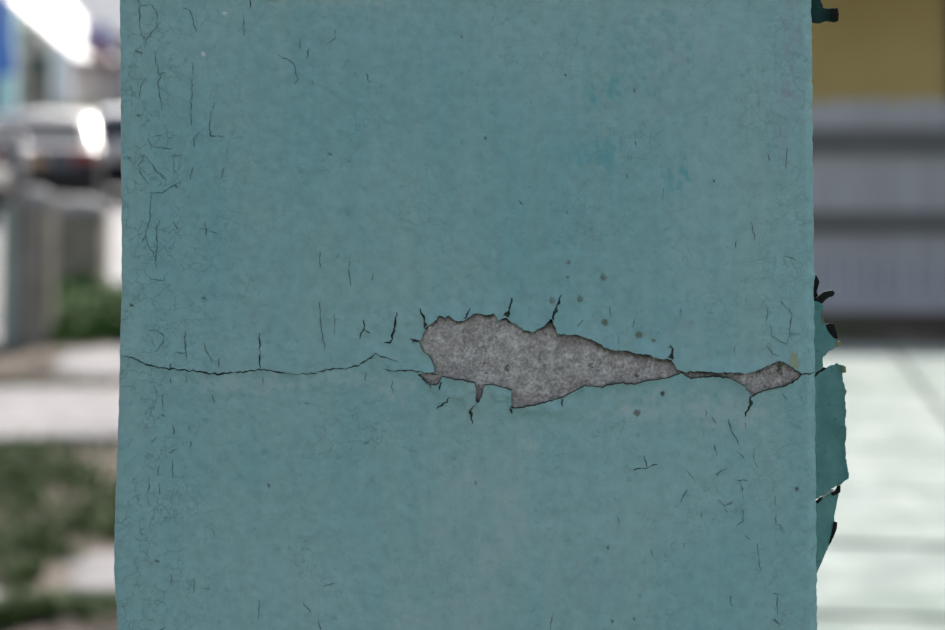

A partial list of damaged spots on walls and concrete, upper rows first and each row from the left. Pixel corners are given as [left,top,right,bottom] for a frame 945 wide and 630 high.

crack [135,0,165,110]
peeling [811,0,839,24]
crack [138,64,222,281]
crack [127,301,440,494]
peeling [411,275,849,572]